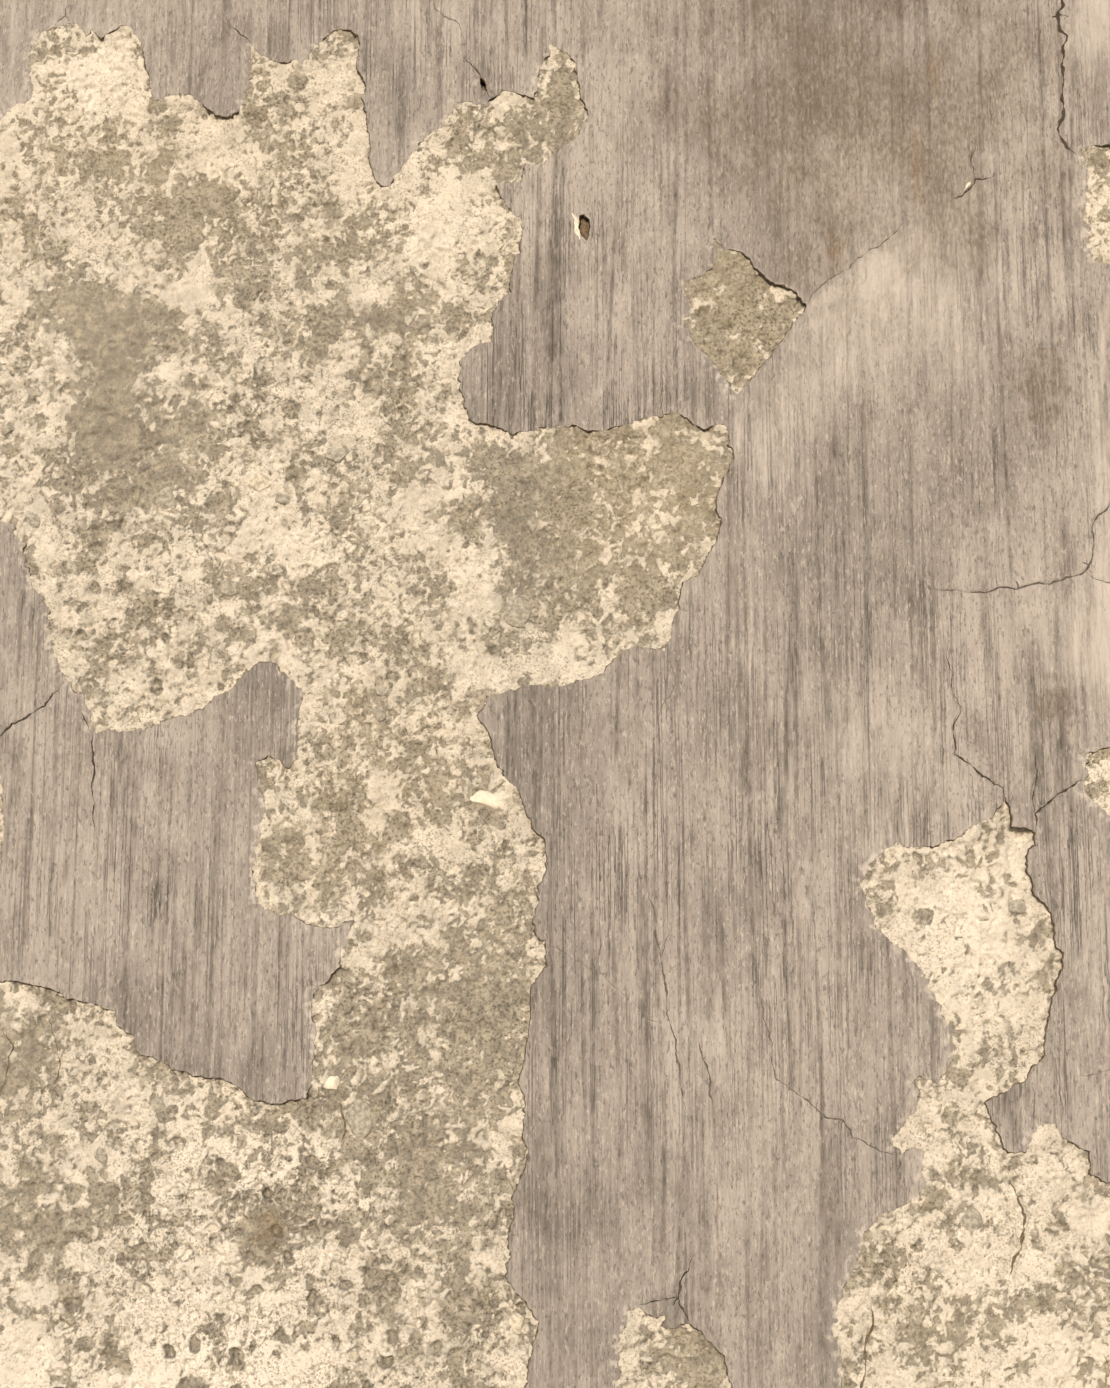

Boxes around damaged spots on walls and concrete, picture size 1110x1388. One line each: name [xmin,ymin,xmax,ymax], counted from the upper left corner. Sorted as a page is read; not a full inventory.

crack [1052,0,1075,154]
spalling [684,238,807,394]
crack [809,221,905,300]
spalling [1081,144,1110,264]
crack [923,503,1110,593]
spalling [0,23,735,1388]
crack [946,647,1082,831]
spalling [1084,747,1110,816]
crack [0,1028,14,1093]
crack [46,1015,61,1090]
spalling [830,797,1110,1388]